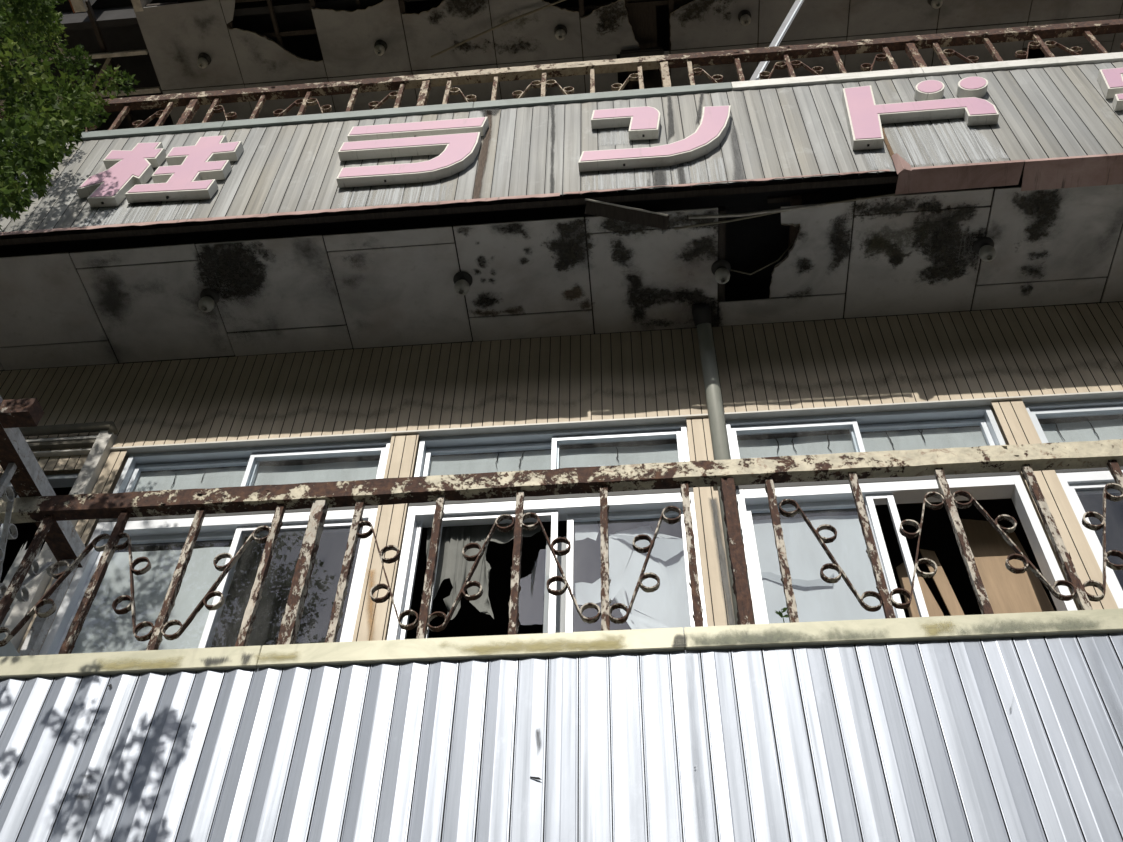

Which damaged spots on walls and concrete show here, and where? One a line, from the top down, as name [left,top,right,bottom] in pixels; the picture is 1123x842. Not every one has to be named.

damp [428,0,486,24]
damp [595,1,628,34]
damp [673,0,732,26]
damp [501,223,529,265]
damp [602,211,720,266]
damp [830,199,987,284]
damp [1013,189,1060,295]
damp [196,242,274,314]
damp [473,243,495,308]